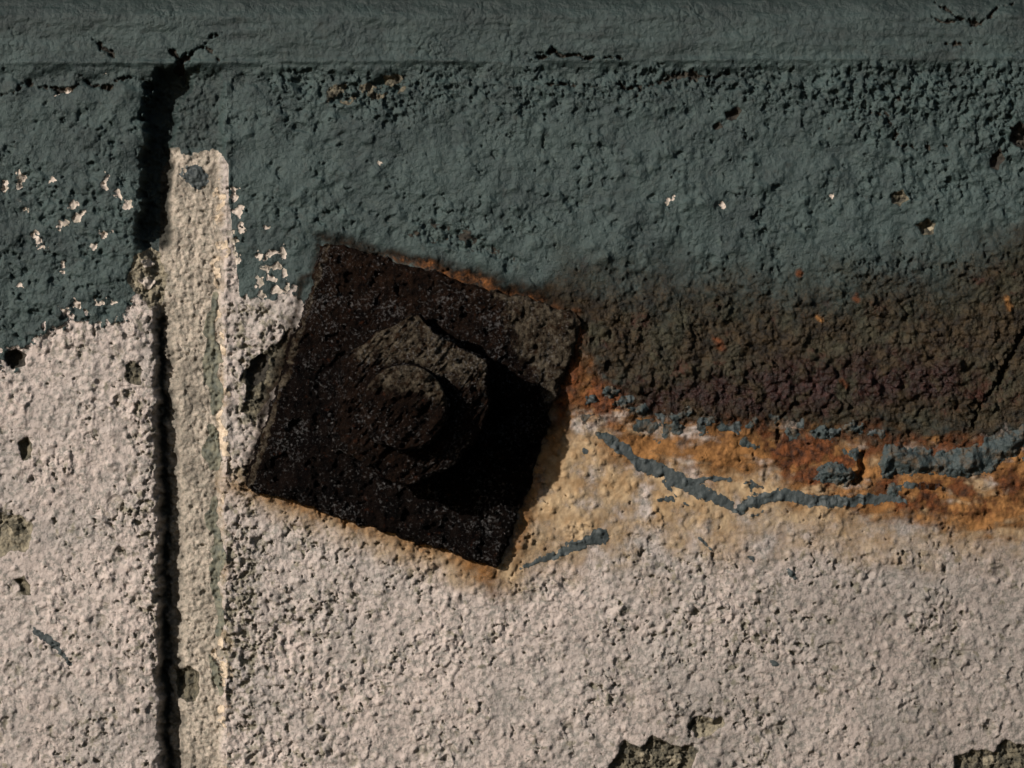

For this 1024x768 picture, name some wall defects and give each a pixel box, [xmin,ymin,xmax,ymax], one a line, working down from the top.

peeling [100,171,133,210]
spalling [127,247,168,307]
peeling [254,244,290,300]
peeling [179,164,246,471]
spalling [5,349,27,369]
spalling [124,361,142,385]
spalling [239,334,286,420]
rust [231,234,1024,588]
spalling [18,437,32,461]
peeling [578,386,1024,497]
spalling [0,511,33,557]
peeling [176,489,234,728]